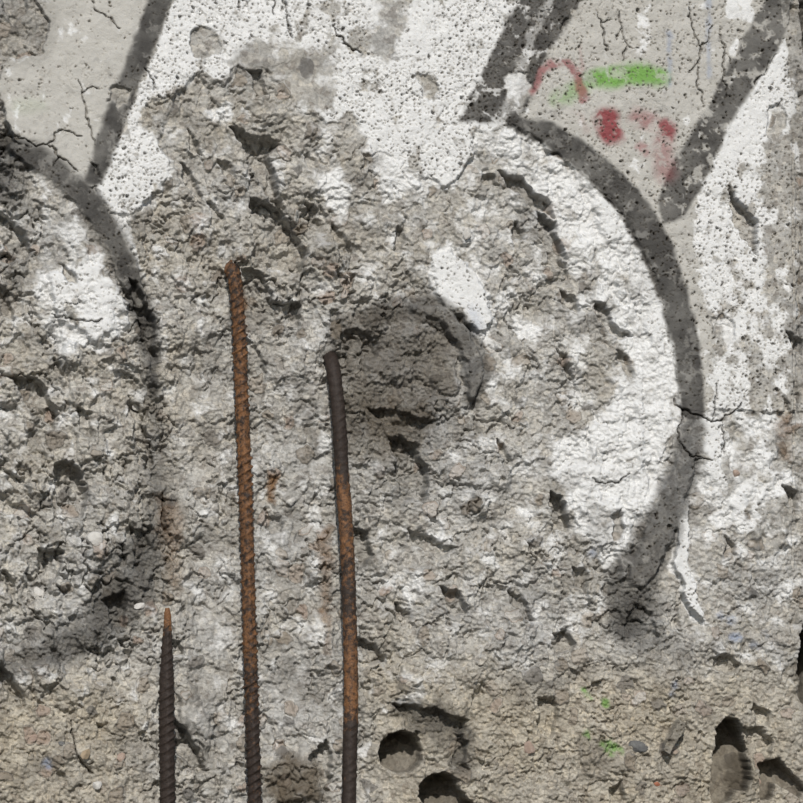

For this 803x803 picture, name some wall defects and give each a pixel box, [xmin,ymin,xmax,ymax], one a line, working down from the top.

spalling [0,0,51,76]
crack [0,80,99,172]
peeling [416,74,440,101]
peeling [504,72,535,115]
peeling [766,103,788,144]
spalling [332,122,680,521]
spalling [0,34,389,803]
crack [673,385,743,461]
spalling [241,270,803,803]